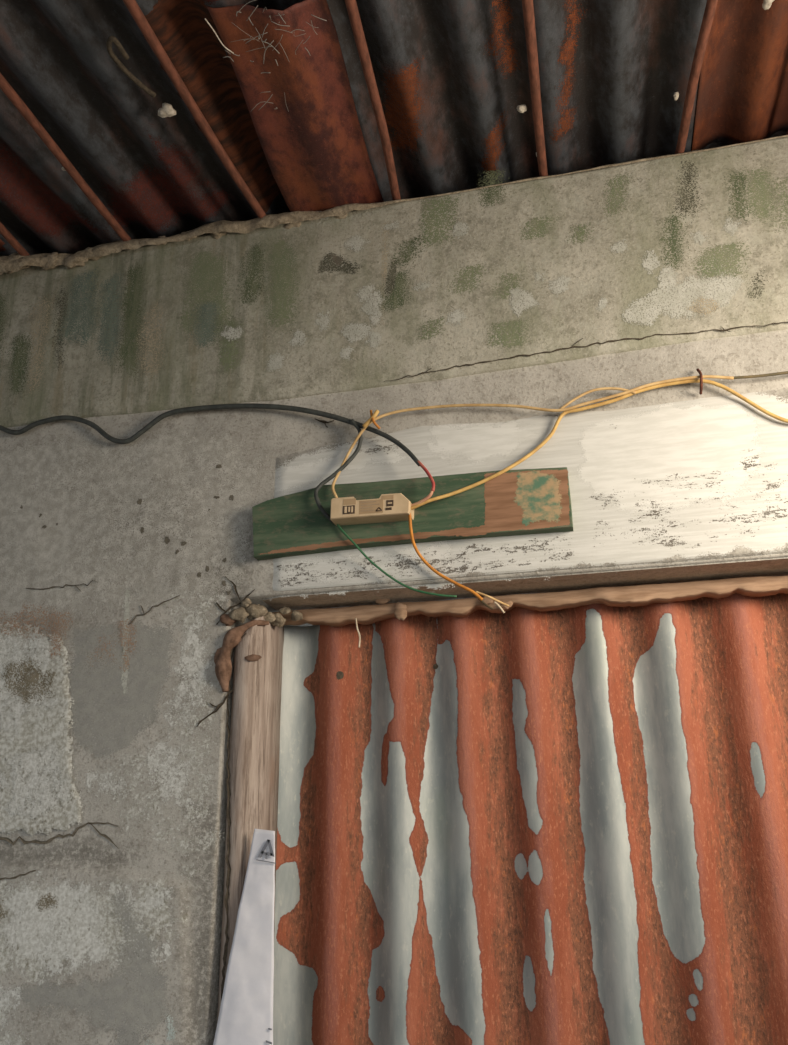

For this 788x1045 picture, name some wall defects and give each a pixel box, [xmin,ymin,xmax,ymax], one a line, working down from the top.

rust [143,0,281,213]
water stain [0,238,308,396]
water stain [340,194,468,360]
water stain [476,168,510,209]
water stain [446,264,571,349]
water stain [518,215,593,244]
crack [384,322,788,382]
water stain [642,158,788,299]
peeling [0,392,788,1045]
crack [0,870,36,880]
crack [0,822,119,849]
rust [276,593,788,1045]